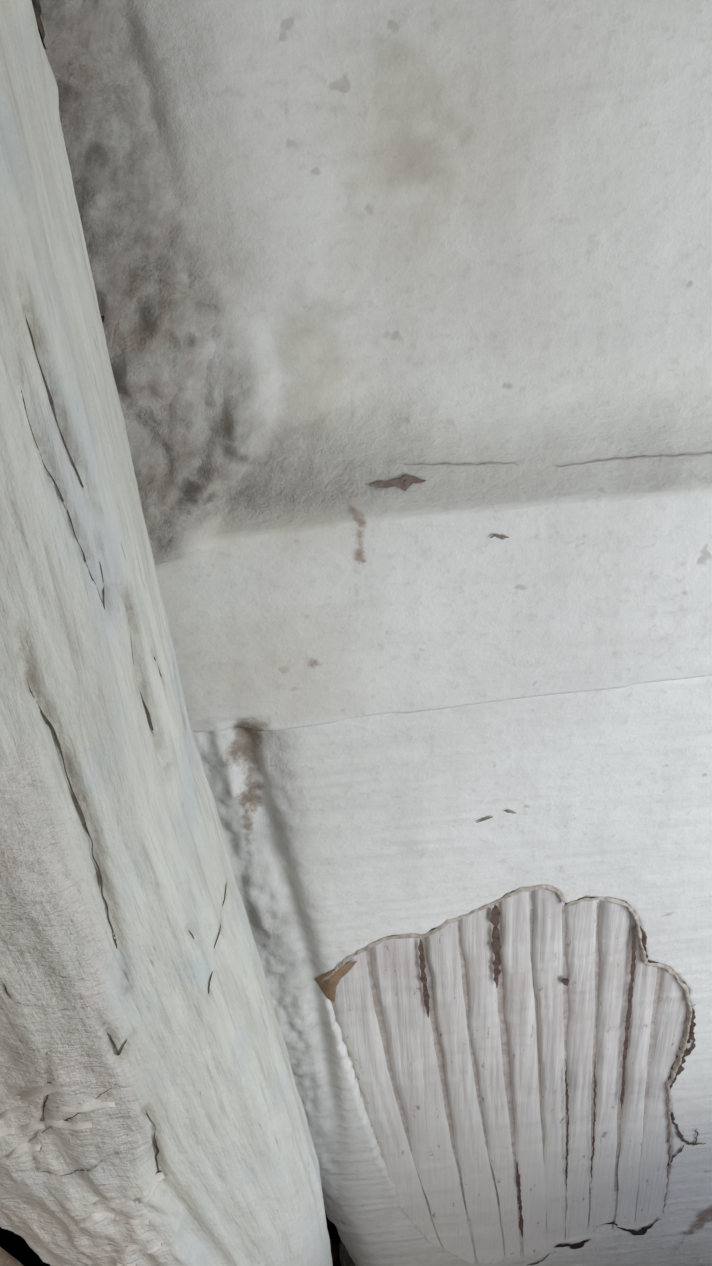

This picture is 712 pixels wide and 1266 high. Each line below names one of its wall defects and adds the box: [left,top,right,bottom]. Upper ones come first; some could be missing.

crack [369,463,518,491]
crack [557,453,712,468]
flaking render [314,885,696,1265]
flaking render [0,1099,116,1160]